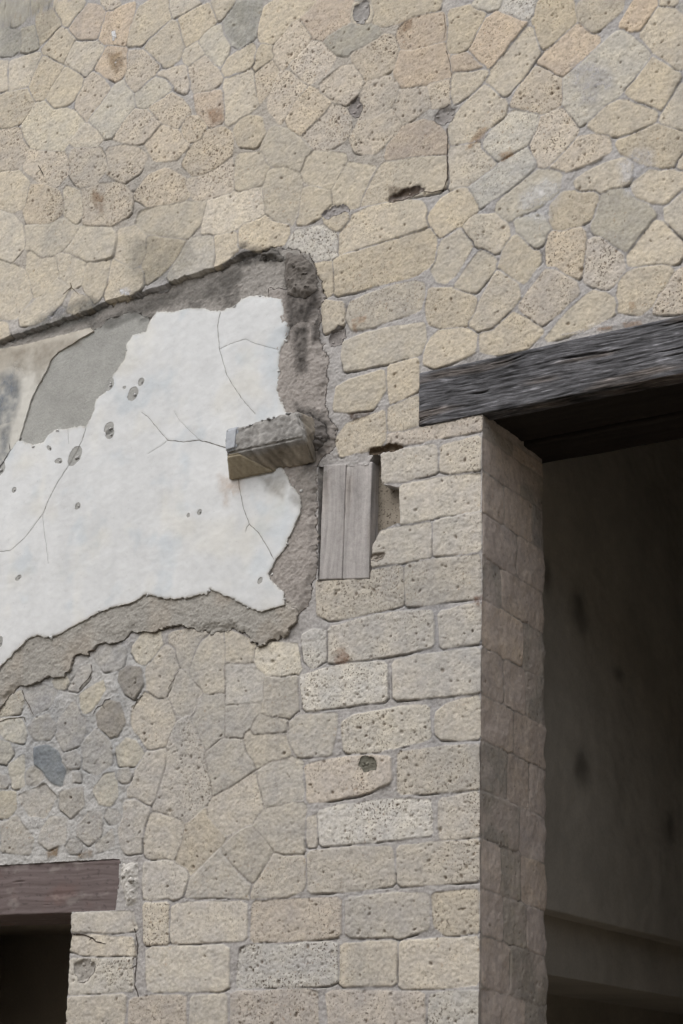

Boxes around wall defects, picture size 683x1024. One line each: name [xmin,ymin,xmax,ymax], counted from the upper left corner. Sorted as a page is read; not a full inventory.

spalling [388,186,424,203]
crack [217,315,275,410]
crack [143,413,226,454]
peeling [0,247,346,709]
crack [238,479,274,559]